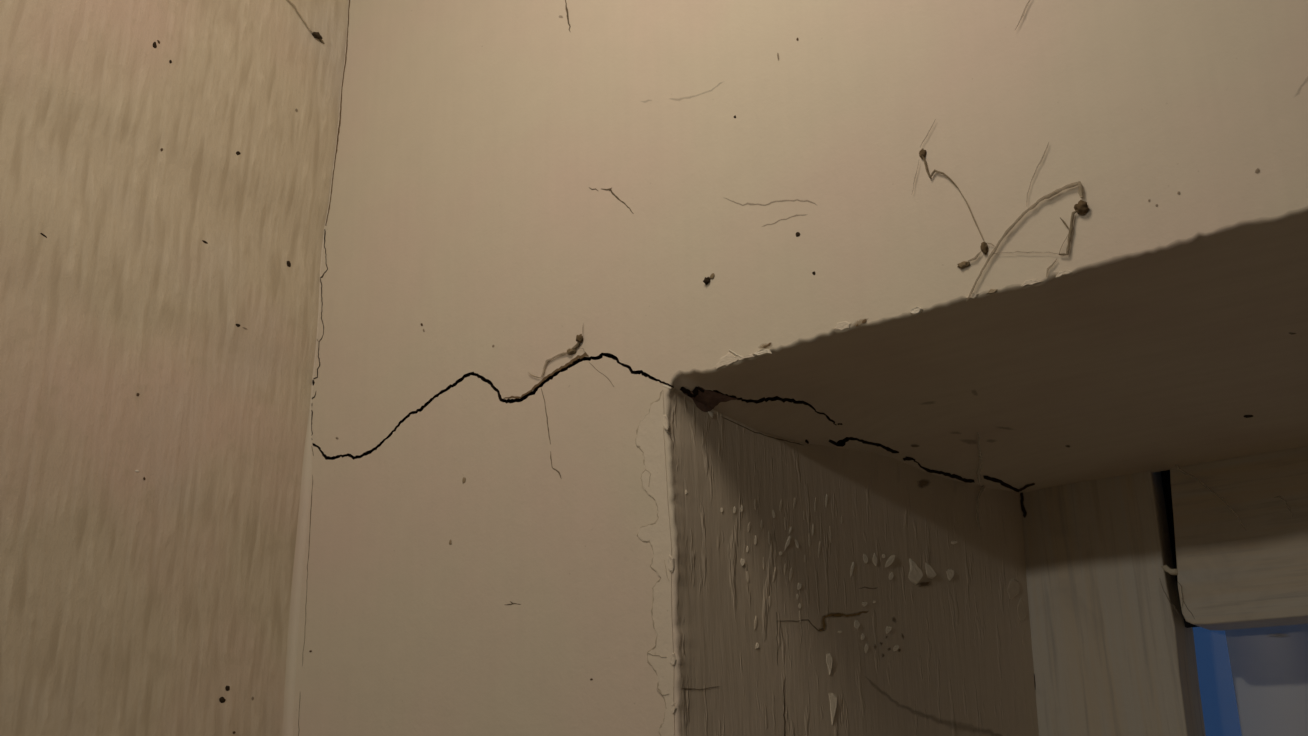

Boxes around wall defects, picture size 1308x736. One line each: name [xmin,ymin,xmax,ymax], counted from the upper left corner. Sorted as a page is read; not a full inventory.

crack [302,0,1035,665]
peeling [721,494,843,649]
peeling [838,553,954,657]
peeling [829,693,837,725]